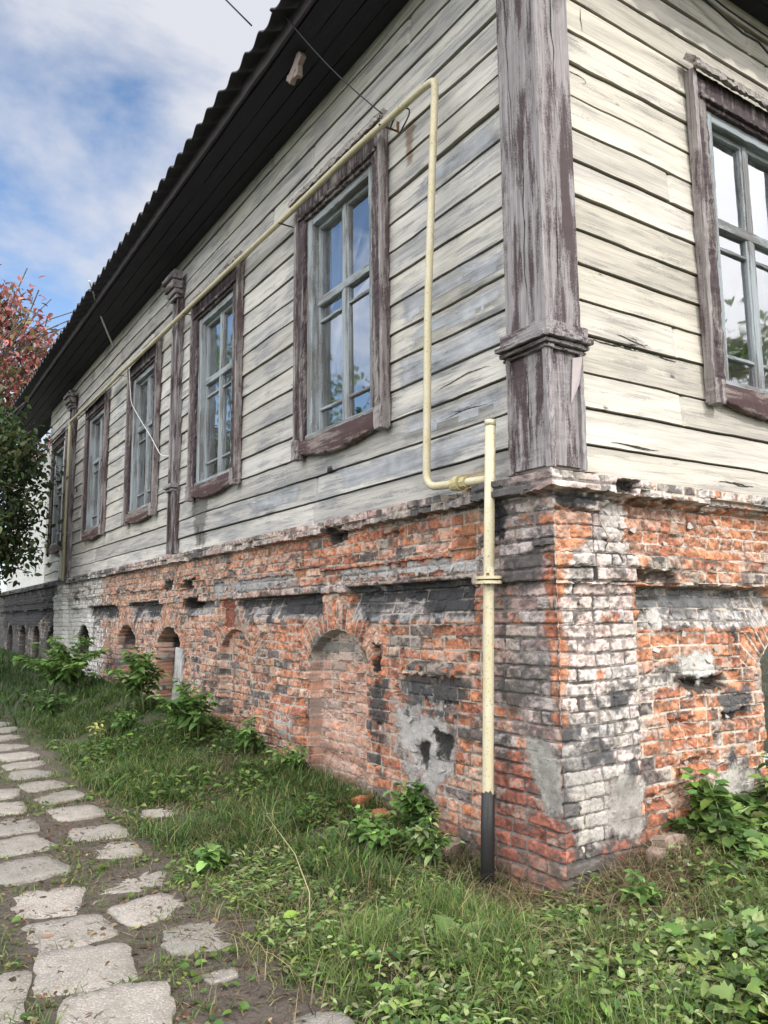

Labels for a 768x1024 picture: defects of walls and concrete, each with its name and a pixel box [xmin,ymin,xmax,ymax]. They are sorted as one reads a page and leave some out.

crack [612,442,658,451]
spalling [320,526,349,545]
peeling [341,555,483,586]
peeling [161,573,297,610]
spalling [542,479,768,729]
peeling [52,592,95,672]
spalling [373,643,382,673]
flaking render [384,685,458,805]